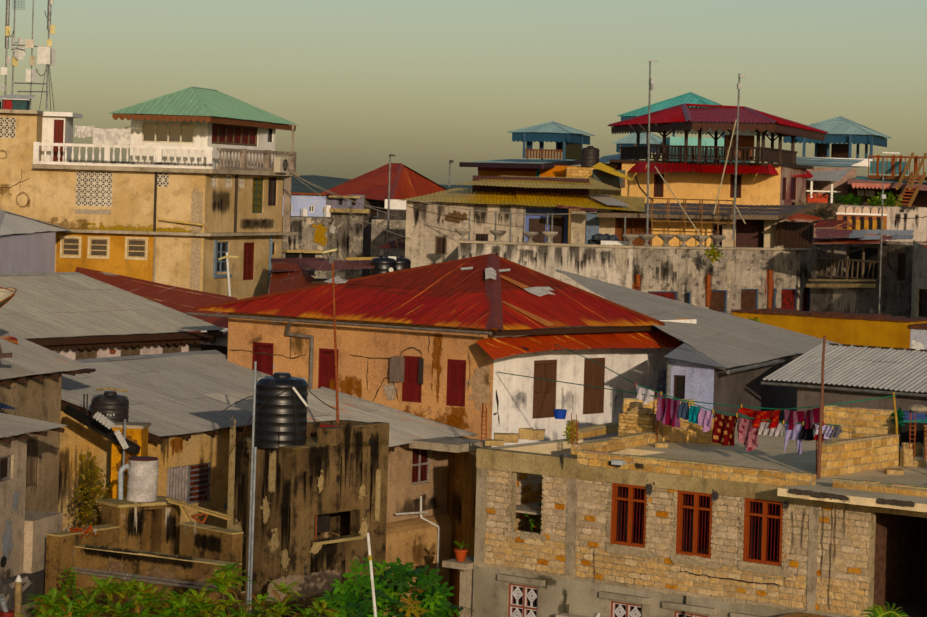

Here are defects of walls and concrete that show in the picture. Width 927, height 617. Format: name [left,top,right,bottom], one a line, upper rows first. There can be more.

corrosion [500,275,529,289]
leakage [656,264,677,281]
leakage [686,257,714,280]
corrosion [502,301,556,327]
leakage [234,433,246,525]
leakage [261,427,290,549]
leakage [303,445,329,498]
leakage [340,422,379,510]
spalling [260,451,342,602]
leakage [311,537,346,573]